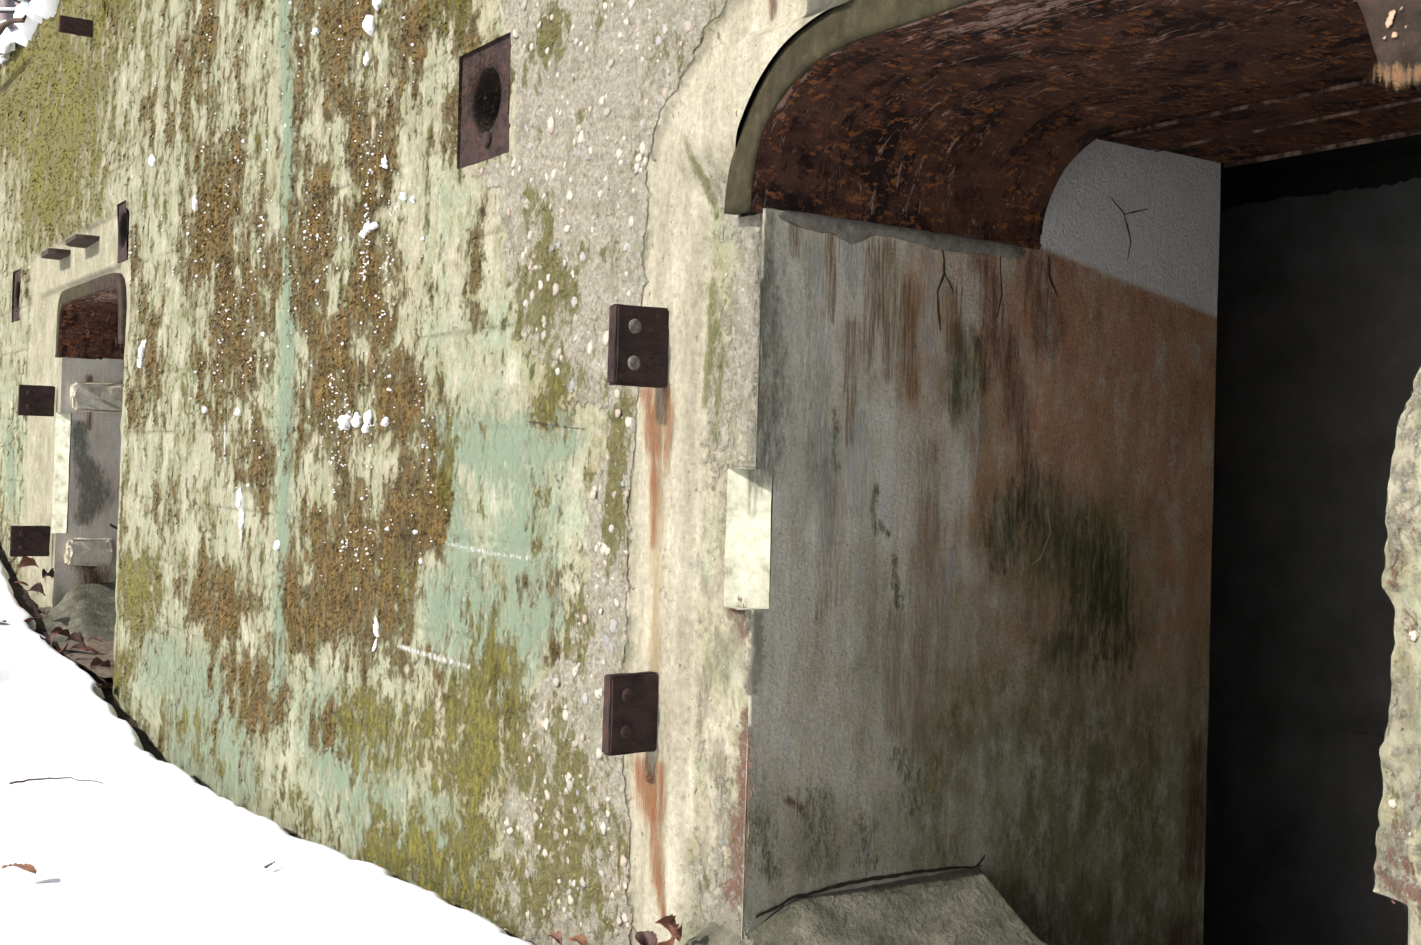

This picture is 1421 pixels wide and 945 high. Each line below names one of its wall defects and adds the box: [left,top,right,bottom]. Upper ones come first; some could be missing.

crack [1111,198,1148,261]
damp [271,0,297,699]
damp [398,645,470,669]
corrosion [640,385,673,551]
damp [988,465,1134,670]
spalling [1385,373,1421,587]
corrosion [634,753,665,919]
spalling [1376,665,1421,902]